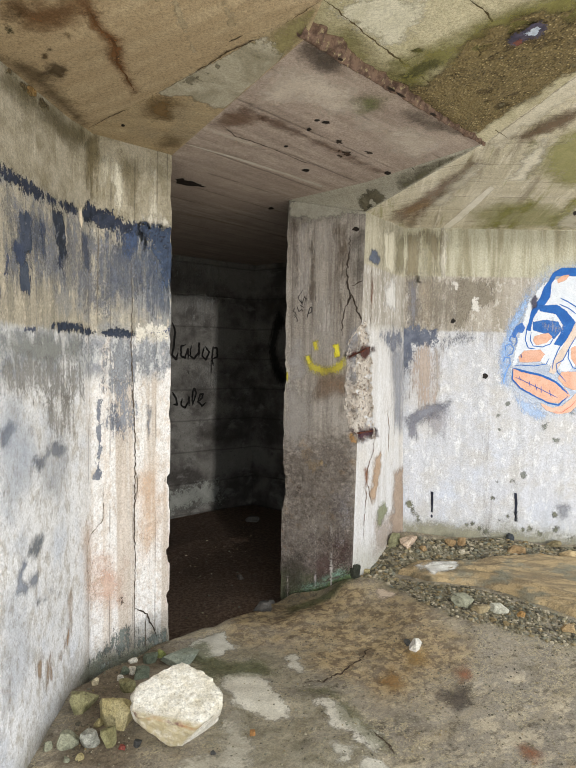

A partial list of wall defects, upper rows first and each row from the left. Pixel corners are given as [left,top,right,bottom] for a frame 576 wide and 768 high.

corrosion [1,0,137,93]
crack [196,35,254,72]
crack [286,0,419,62]
leakage [435,165,482,206]
leakage [508,142,548,181]
leakage [549,199,576,228]
crack [341,236,362,336]
spalling [344,322,376,443]
corrosion [347,345,375,359]
crack [130,264,157,649]
corrosion [350,427,379,443]
leakage [283,525,352,597]